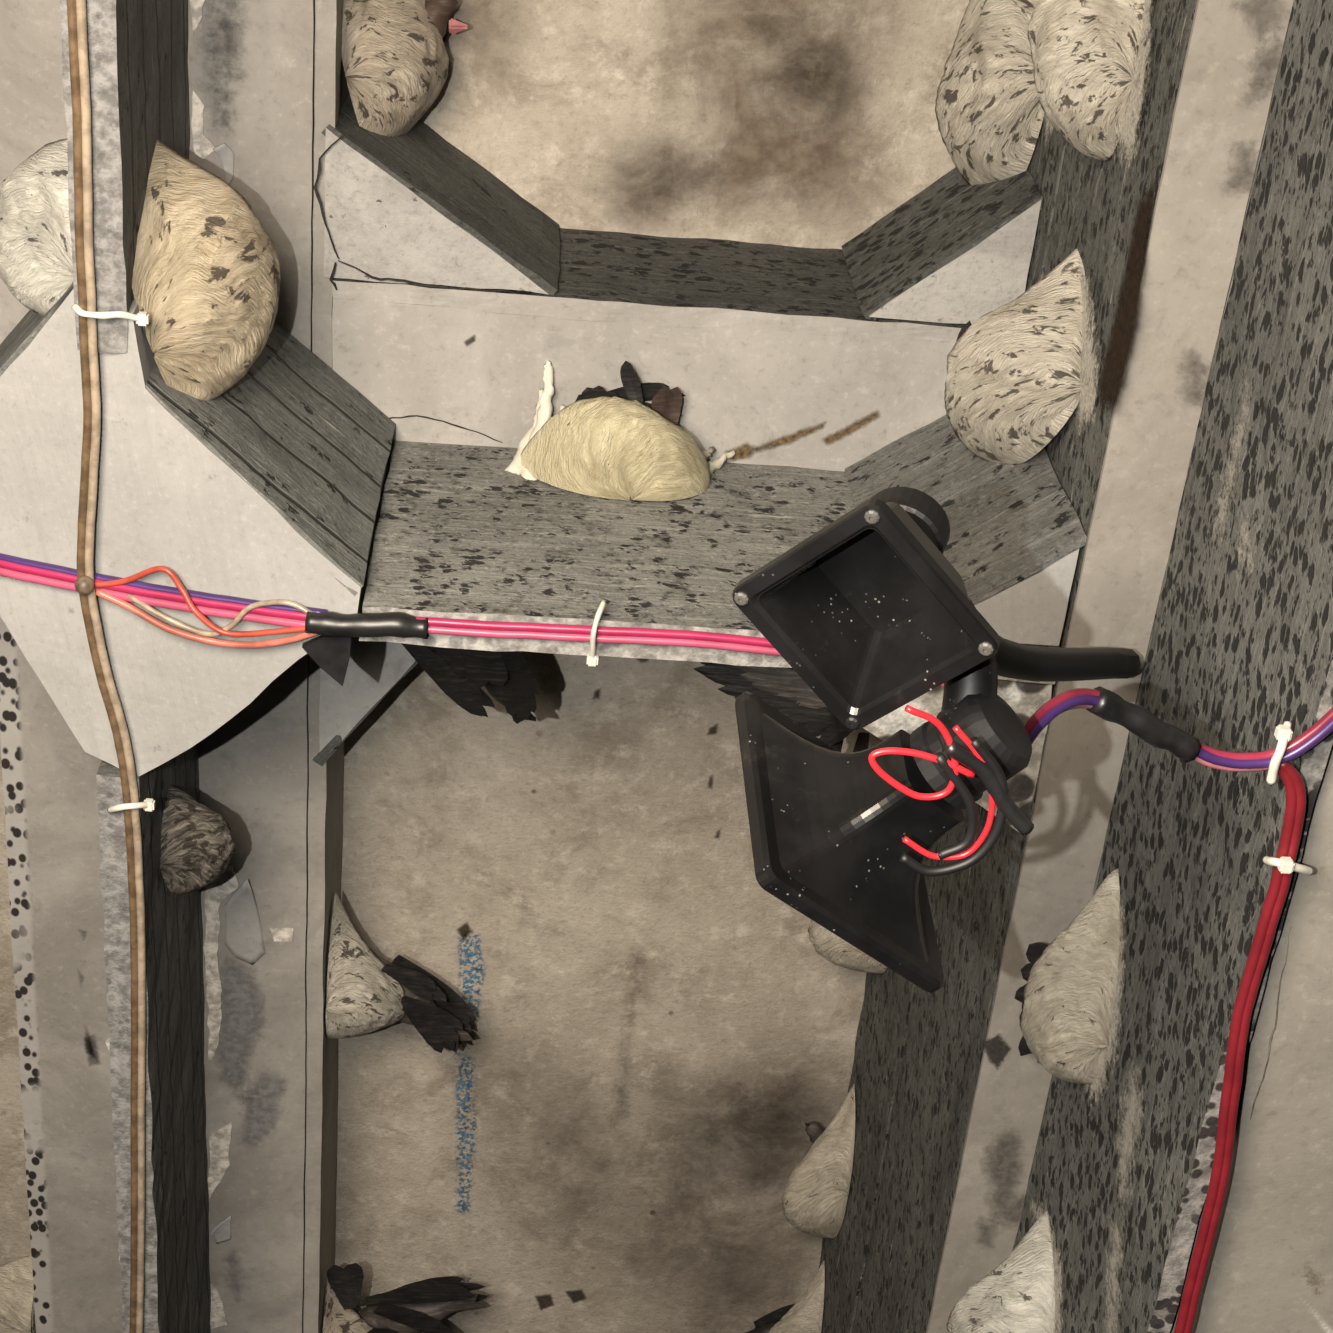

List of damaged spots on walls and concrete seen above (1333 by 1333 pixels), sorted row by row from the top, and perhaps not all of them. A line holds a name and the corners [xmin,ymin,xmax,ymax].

leakage [653,0,852,194]
peeling [203,865,294,1060]
peeling [207,1122,232,1200]
peeling [210,1283,227,1329]
leakage [536,1290,586,1310]